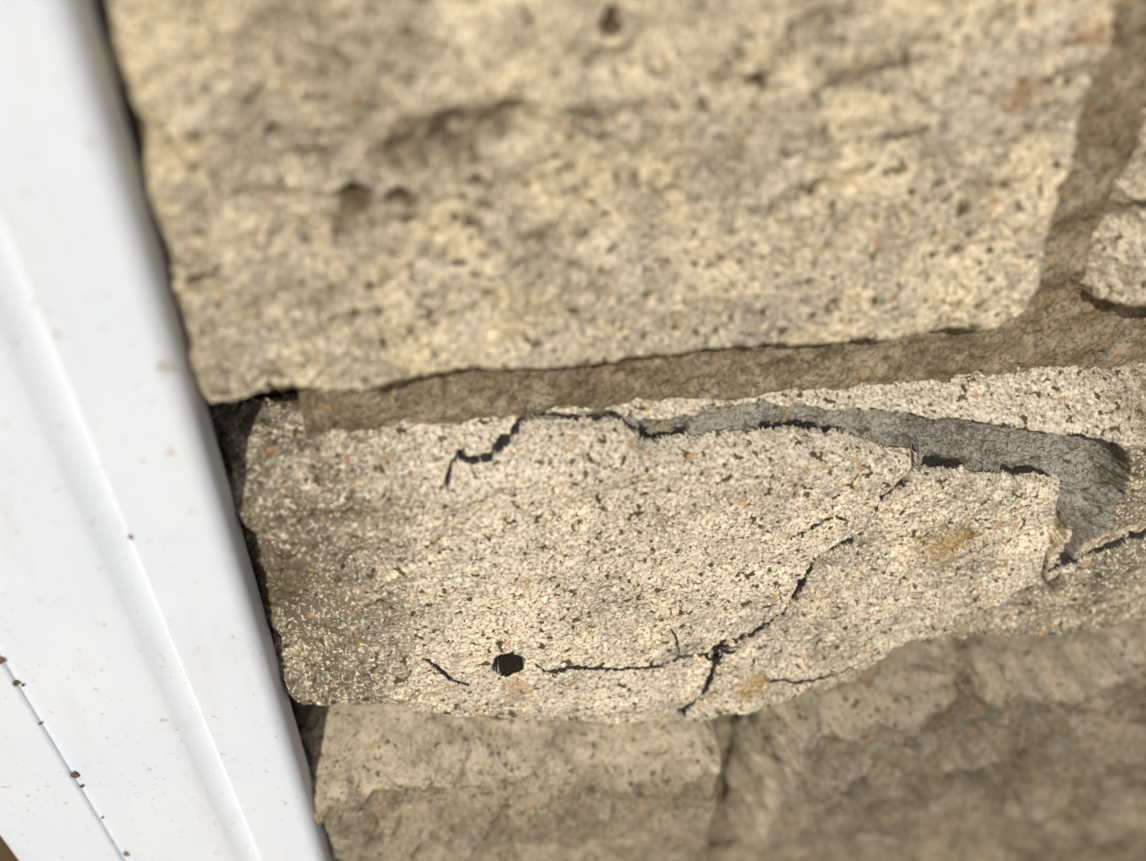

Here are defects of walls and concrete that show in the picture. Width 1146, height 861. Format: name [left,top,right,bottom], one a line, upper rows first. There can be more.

crack [423,658,469,686]
crack [439,411,637,491]
crack [536,444,916,717]
spalling [407,398,1130,724]